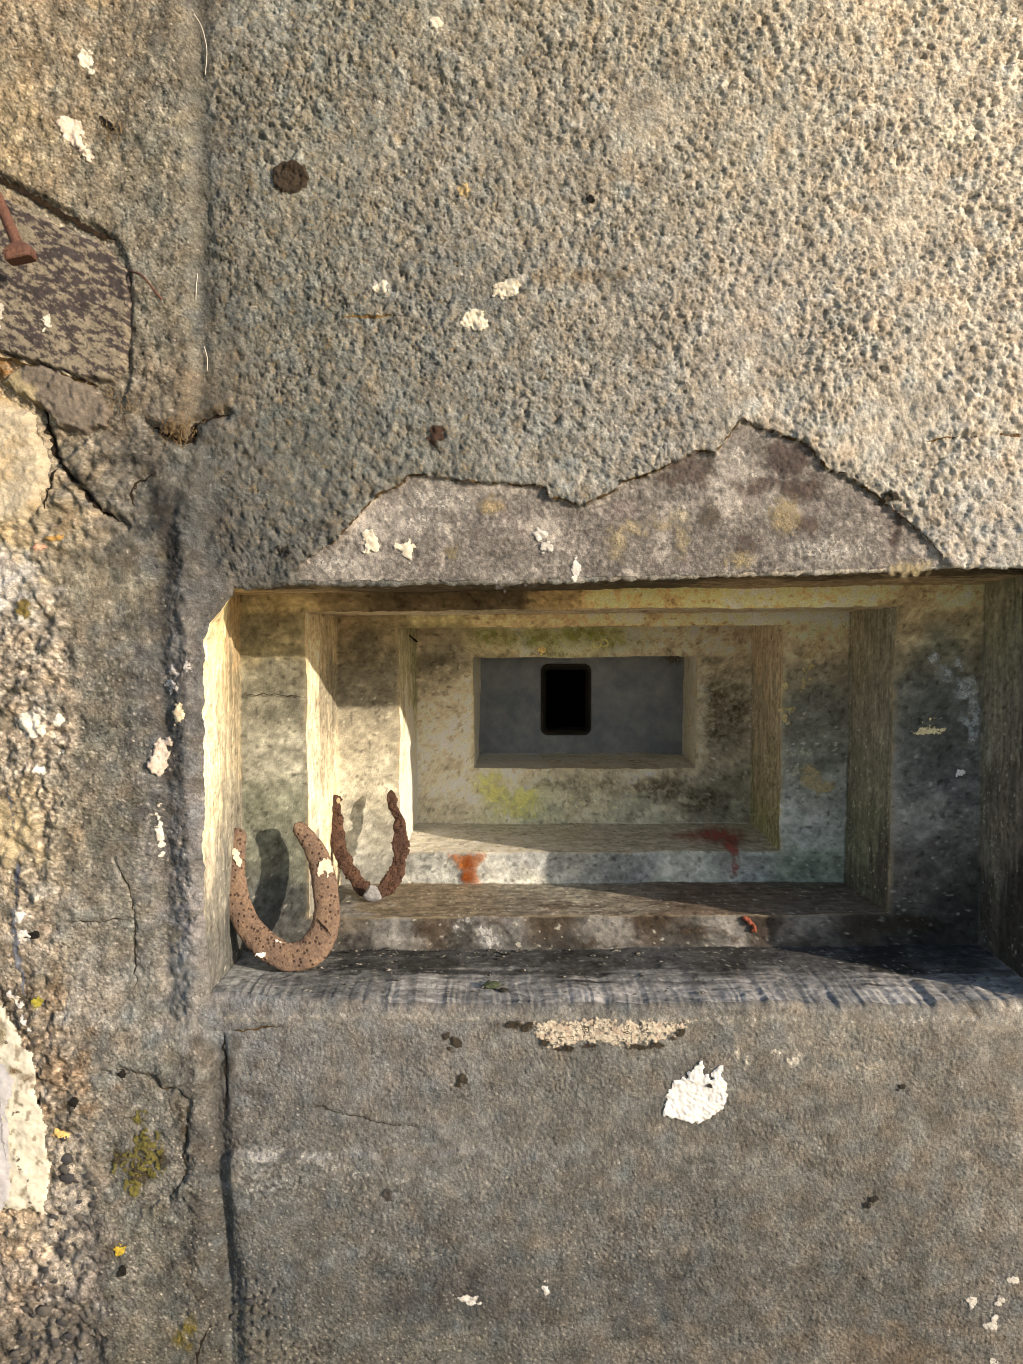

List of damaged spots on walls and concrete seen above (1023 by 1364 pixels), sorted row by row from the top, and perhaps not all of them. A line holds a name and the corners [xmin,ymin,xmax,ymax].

crack [150,414,229,445]
crack [926,433,1021,442]
crack [43,409,153,525]
flaking render [295,418,952,583]
crack [196,1326,211,1364]